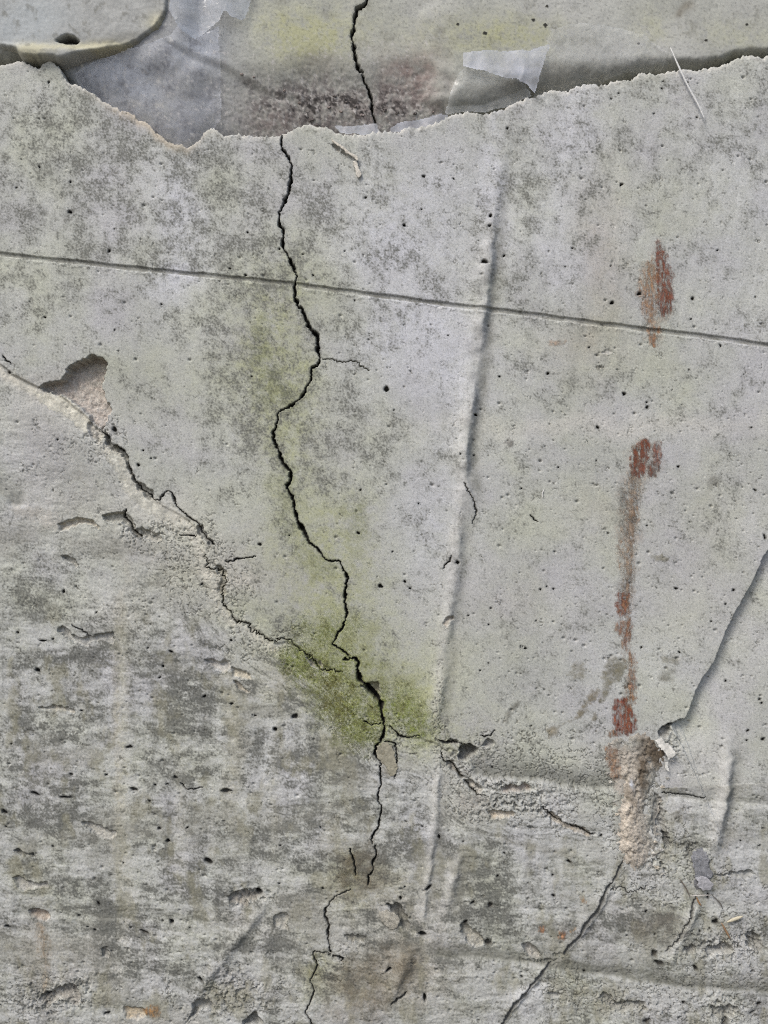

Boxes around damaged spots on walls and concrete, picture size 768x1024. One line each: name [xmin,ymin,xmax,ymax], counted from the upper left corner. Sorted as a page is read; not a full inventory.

crack [348,0,380,131]
rust [643,246,674,347]
crack [1,355,12,365]
spalling [39,354,154,501]
rust [630,439,662,478]
crack [71,624,91,637]
crack [100,136,496,1024]
rust [605,491,638,778]
peeling [655,725,676,772]
spalling [652,797,673,874]
crack [500,861,647,1024]